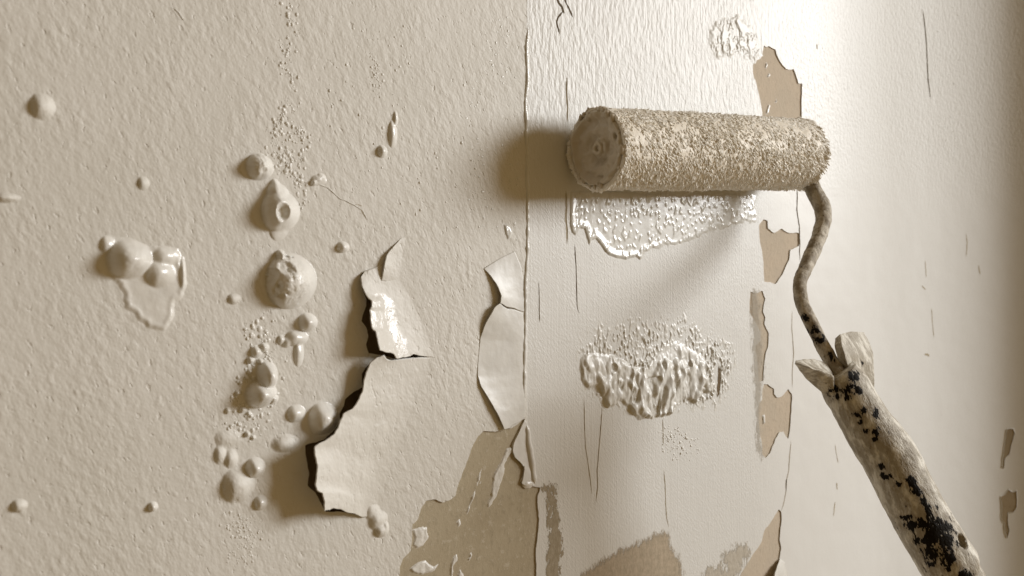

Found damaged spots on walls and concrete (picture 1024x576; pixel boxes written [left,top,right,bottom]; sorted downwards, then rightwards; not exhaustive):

crack [556,0,573,34]
peeling [749,220,799,458]
peeling [305,237,434,517]
peeling [399,251,540,576]
peeling [1001,428,1015,469]
flaking render [581,531,682,576]
peeling [701,510,788,576]
peeling [1000,489,1018,538]